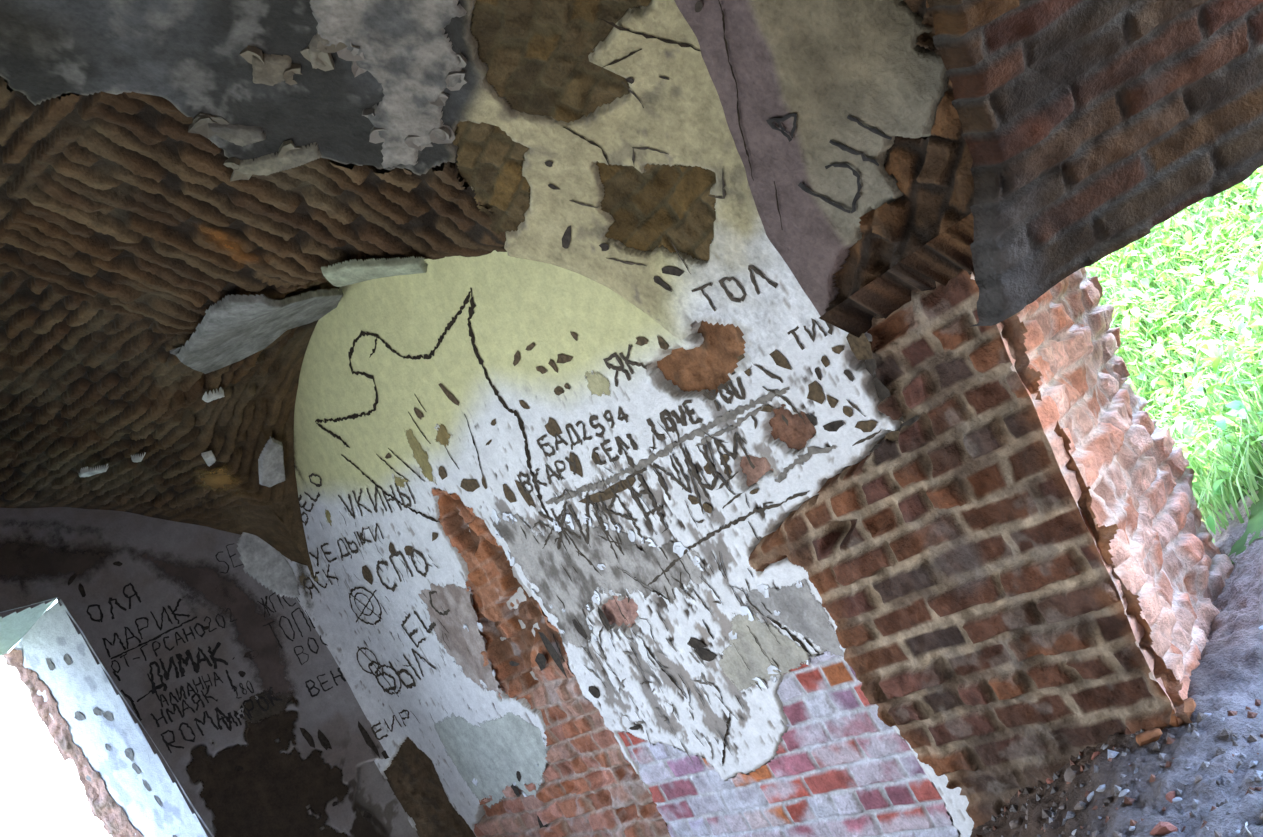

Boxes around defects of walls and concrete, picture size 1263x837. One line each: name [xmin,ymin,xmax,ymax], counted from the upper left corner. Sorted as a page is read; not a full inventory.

spalling [903,0,940,56]
spalling [0,0,651,578]
spalling [358,77,1193,837]
spalling [2,649,143,837]
spalling [105,744,162,807]
spalling [186,691,349,837]